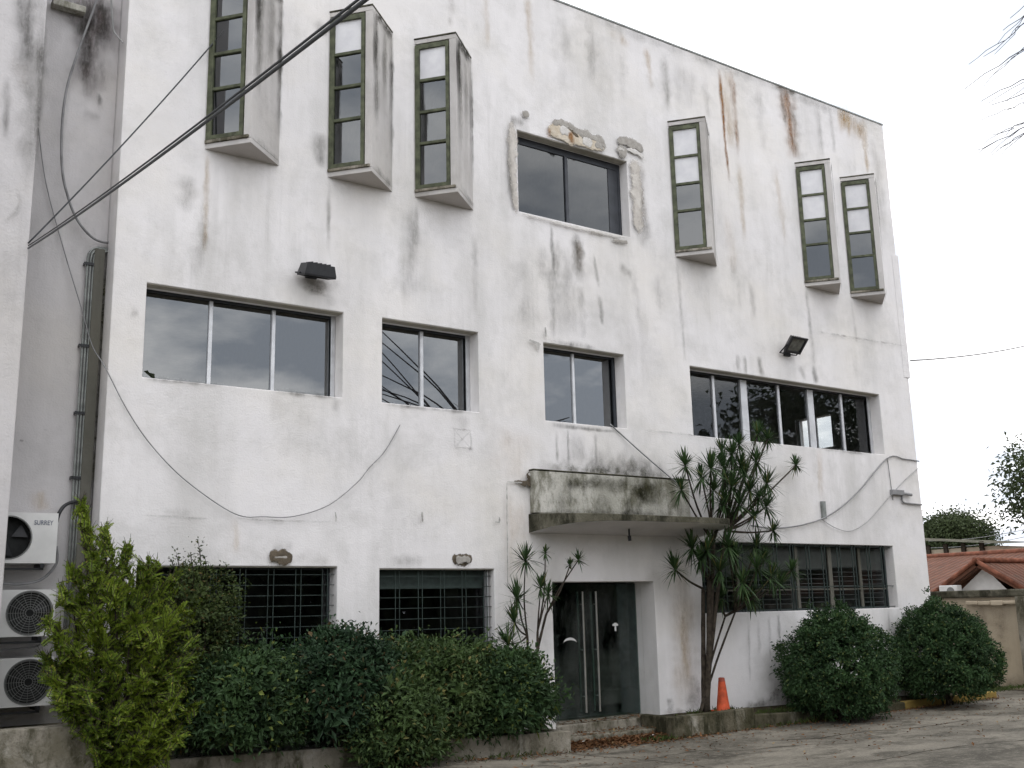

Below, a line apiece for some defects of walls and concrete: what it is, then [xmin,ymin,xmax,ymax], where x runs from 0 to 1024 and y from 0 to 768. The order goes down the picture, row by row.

leakage [80,1,110,81]
flaking render [507,111,644,244]